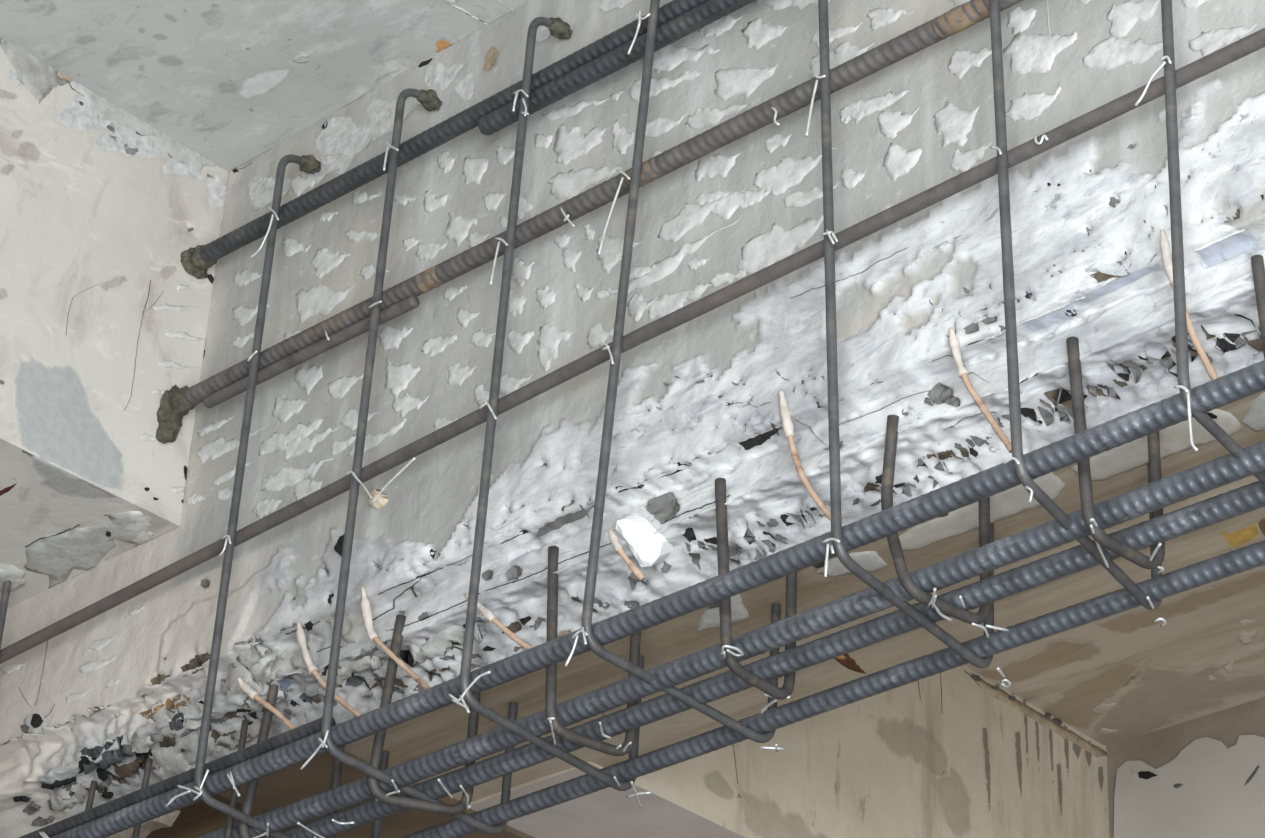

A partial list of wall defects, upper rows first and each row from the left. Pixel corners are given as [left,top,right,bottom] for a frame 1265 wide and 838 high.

damp [137,14,185,71]
corrosion [932,0,990,39]
corrosion [625,157,663,188]
corrosion [415,266,443,293]
spalling [929,251,1160,348]
spalling [170,258,572,519]
spalling [853,314,1265,506]
flaking render [482,395,825,613]
flaking render [899,472,1065,551]
spalling [502,616,546,652]
spalling [13,612,496,826]
flaking render [1114,735,1265,838]